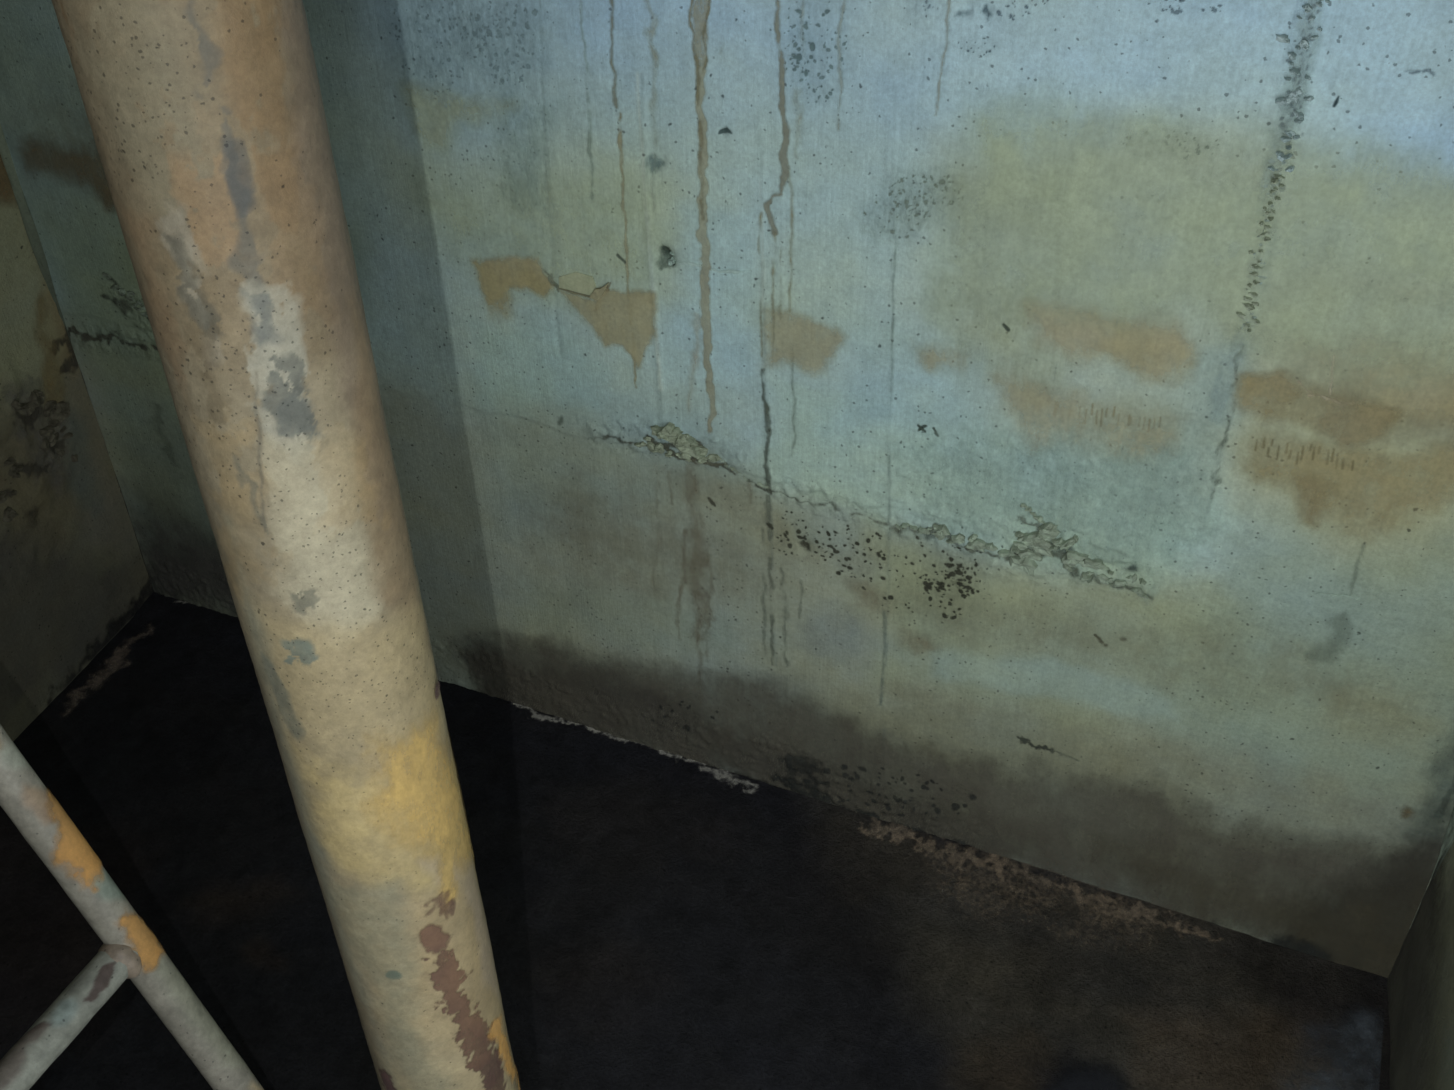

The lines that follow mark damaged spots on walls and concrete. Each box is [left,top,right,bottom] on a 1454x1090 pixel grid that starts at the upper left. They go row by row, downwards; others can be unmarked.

crack [68,326,158,351]
corrosion [689,0,717,432]
water stain [762,370,772,538]
crack [720,459,836,509]
corrosion [379,727,519,1090]
water stain [464,638,1454,1090]